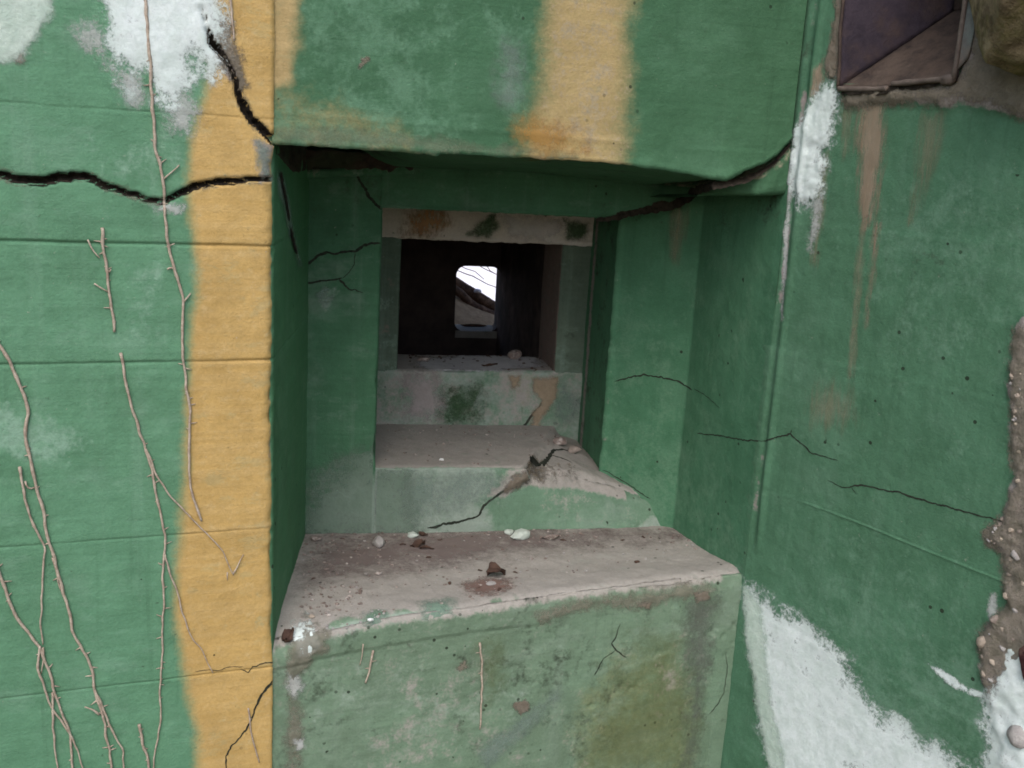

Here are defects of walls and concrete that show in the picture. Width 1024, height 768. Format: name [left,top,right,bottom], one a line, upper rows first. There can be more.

water stain [76,0,250,132]
crack [202,8,272,143]
crack [0,171,272,205]
water stain [781,79,850,318]
corrosion [850,103,884,360]
water stain [402,355,545,420]
crack [428,490,504,529]
crack [527,448,576,474]
spalling [976,327,1024,688]
crack [195,662,273,768]
water stain [743,583,970,768]
water stain [934,649,1024,768]